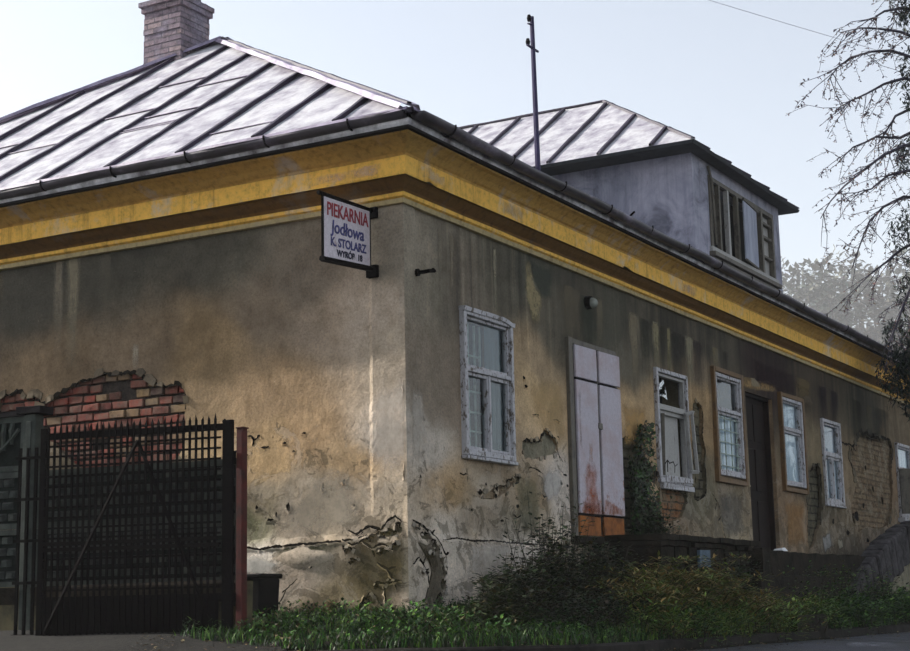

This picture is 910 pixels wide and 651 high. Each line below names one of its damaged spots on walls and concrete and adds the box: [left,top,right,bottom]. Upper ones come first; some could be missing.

damp [55,258,79,334]
spalling [0,368,189,468]
spalling [522,428,558,461]
damp [629,314,700,369]
spalling [622,398,707,535]
damp [744,360,808,396]
spalling [806,463,835,546]
spalling [342,522,448,605]
crack [247,514,571,611]